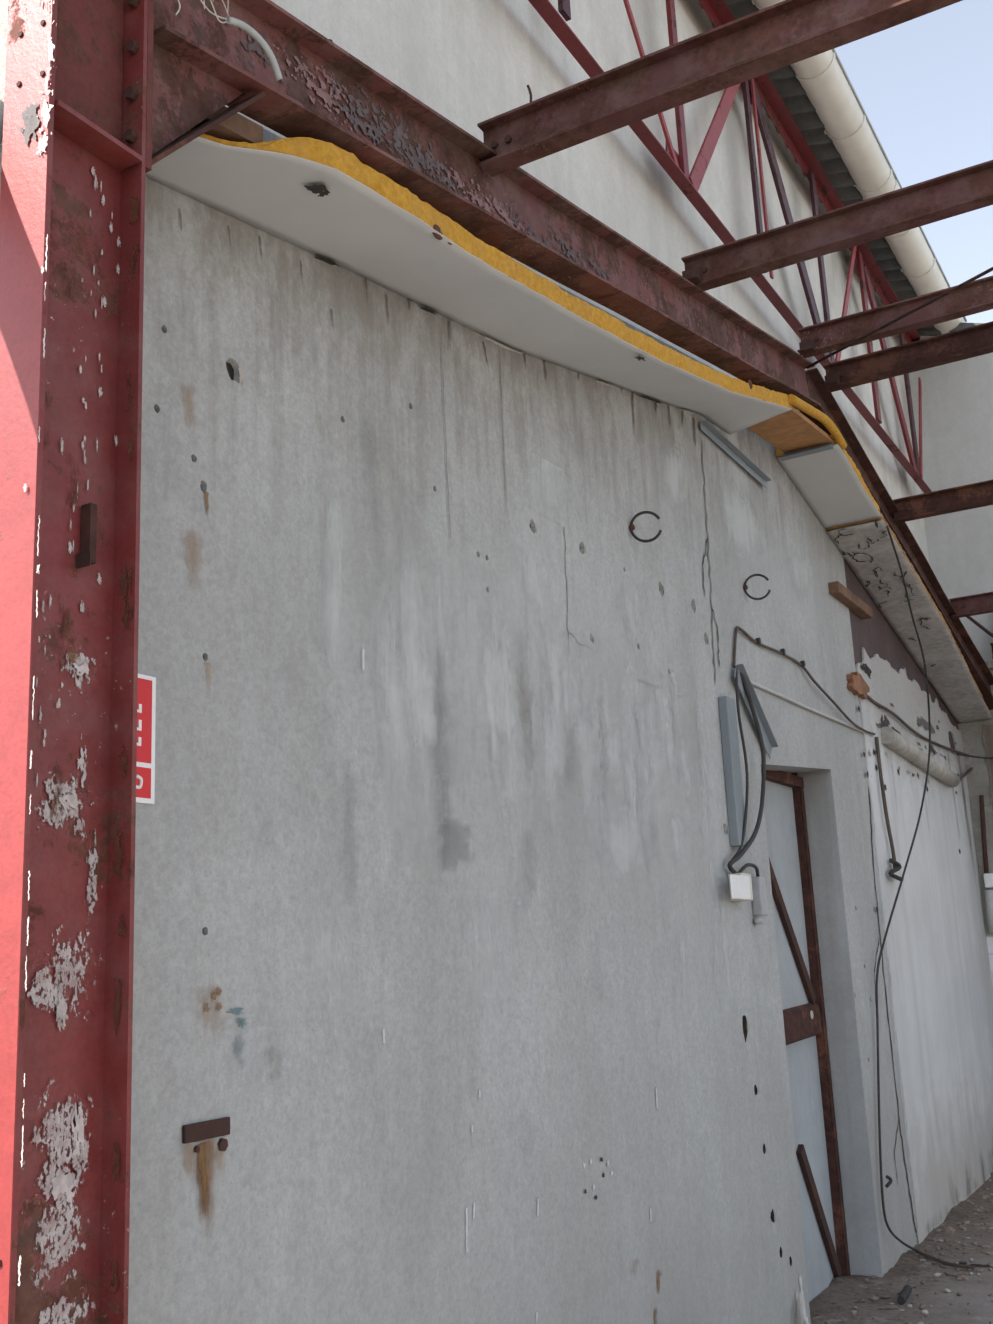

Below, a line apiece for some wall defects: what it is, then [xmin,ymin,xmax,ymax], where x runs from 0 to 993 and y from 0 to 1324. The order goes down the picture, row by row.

peeling [82,166,121,317]
peeling [25,651,102,1031]
peeling [18,1073,96,1324]
corrosion [198,1140,213,1208]